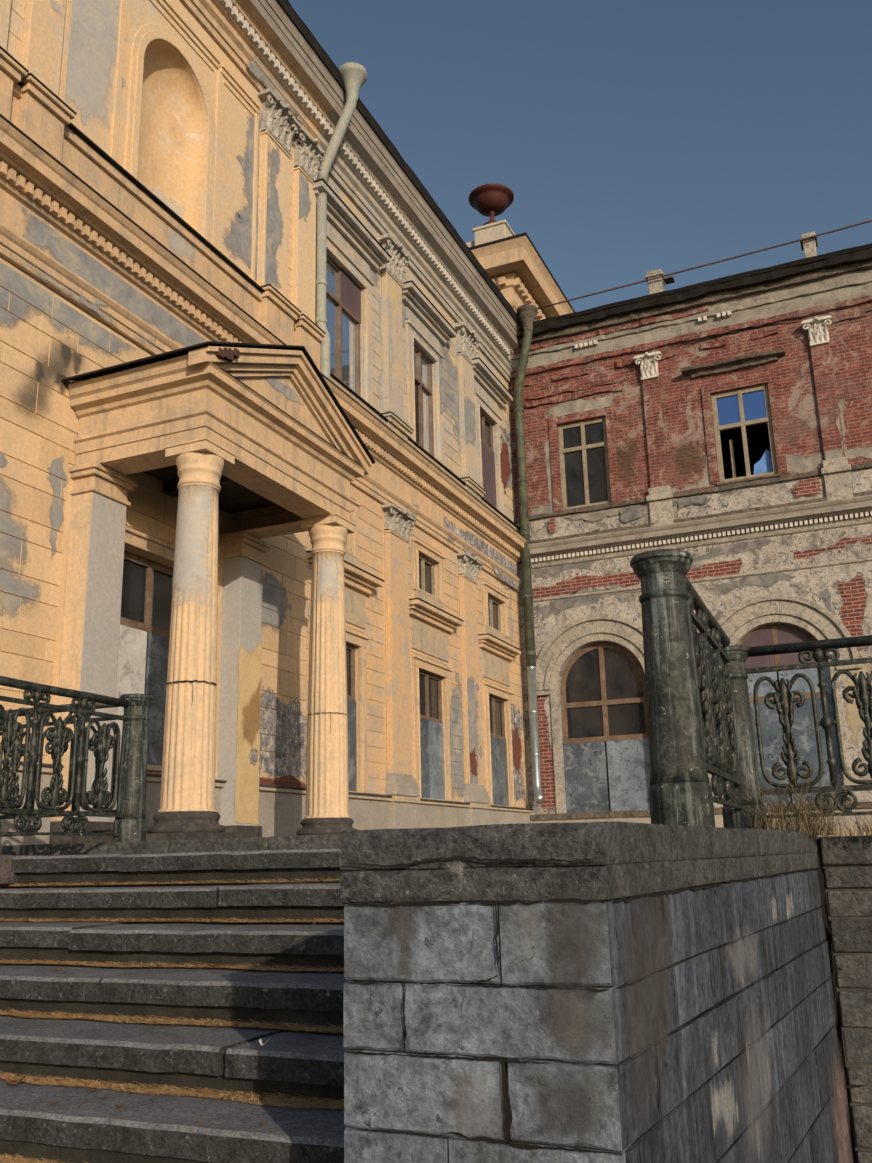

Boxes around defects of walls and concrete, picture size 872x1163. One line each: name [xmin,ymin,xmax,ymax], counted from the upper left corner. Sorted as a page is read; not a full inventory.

peeling [52,0,125,124]
peeling [142,183,185,217]
peeling [224,116,283,287]
peeling [299,172,311,222]
peeling [0,208,240,364]
peeling [0,453,39,617]
flaking render [789,473,822,497]
peeling [260,573,291,631]
flaking render [819,575,870,744]
flaking render [249,687,307,788]
flaking render [510,690,556,813]
crack [449,1060,548,1150]